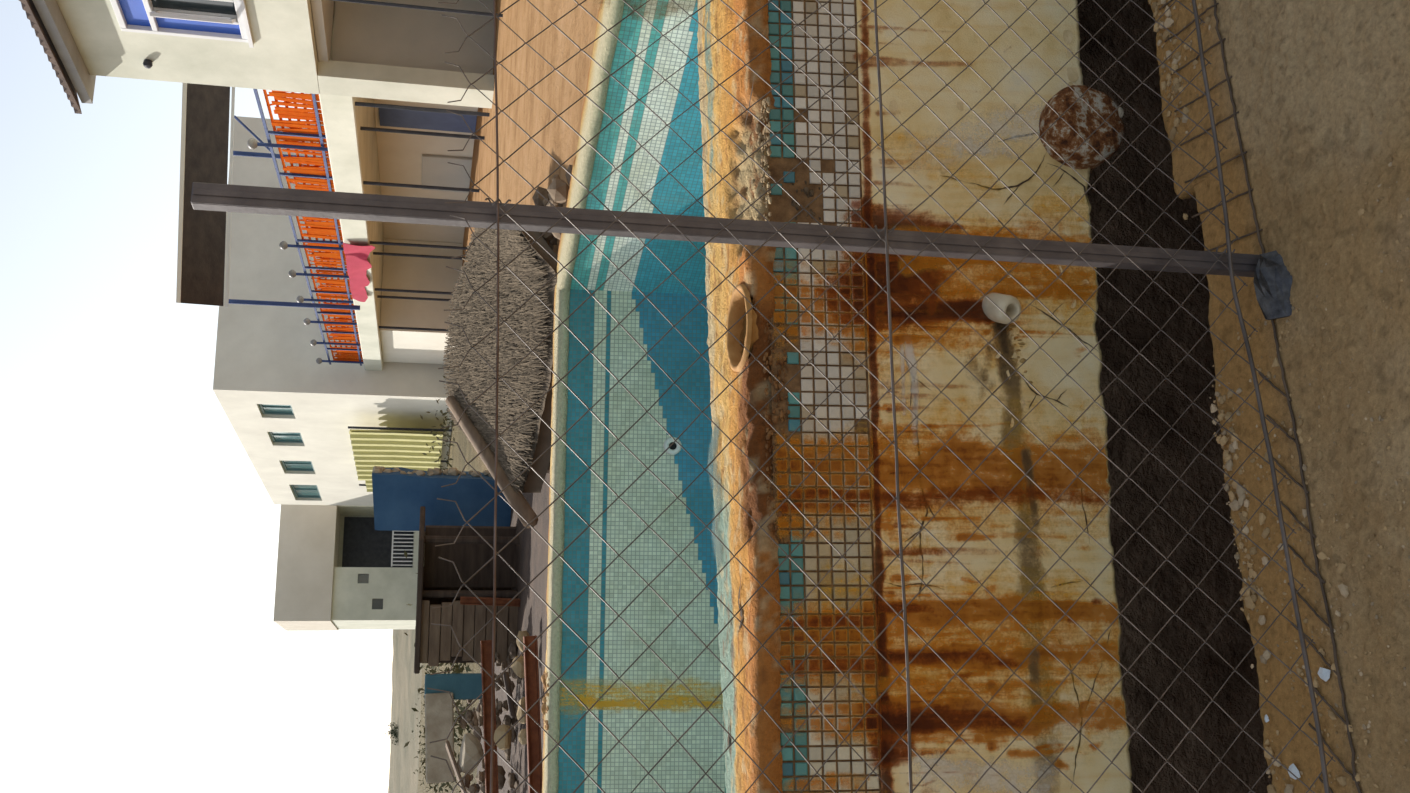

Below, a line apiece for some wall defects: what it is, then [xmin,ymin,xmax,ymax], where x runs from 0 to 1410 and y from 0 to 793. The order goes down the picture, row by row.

spalling [751,97,772,221]
rust [844,0,1091,243]
spalling [763,306,791,544]
rust [774,251,1126,793]
rust [560,680,723,711]